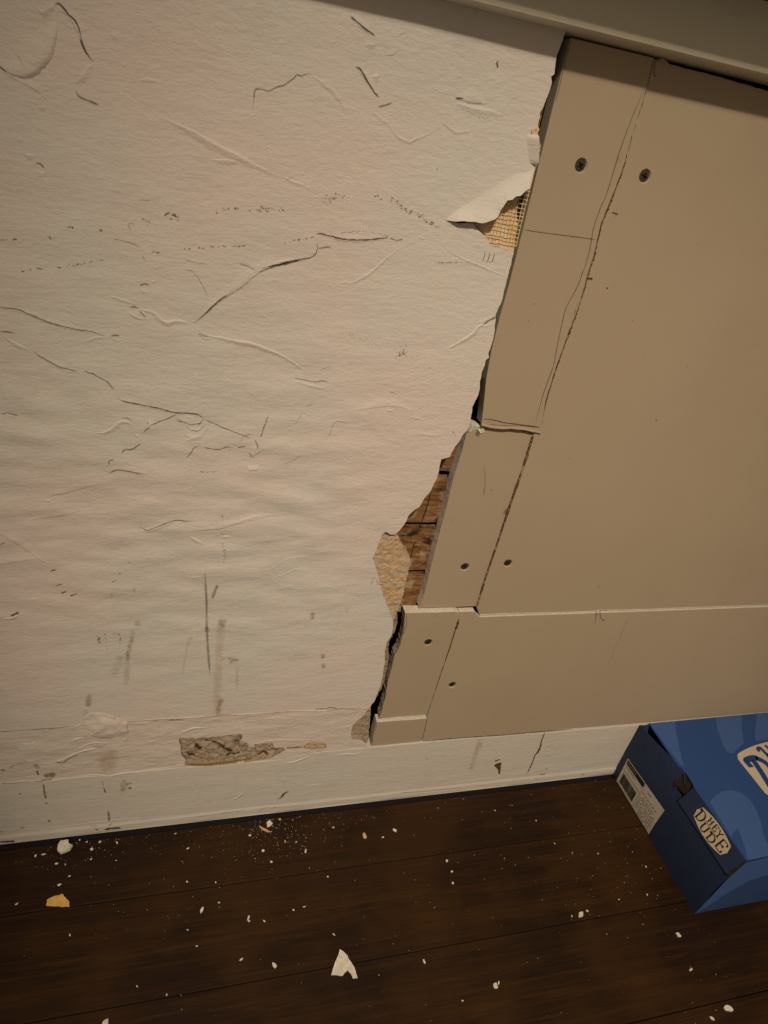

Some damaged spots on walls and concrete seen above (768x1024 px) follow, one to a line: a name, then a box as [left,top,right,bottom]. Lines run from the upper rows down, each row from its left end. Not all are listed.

crack [37,3,95,84]
crack [351,15,376,37]
crack [356,67,380,99]
spalling [654,58,768,91]
flaking render [446,125,541,261]
crack [110,233,388,372]
crack [0,307,118,374]
crack [117,398,200,416]
spalling [468,380,485,433]
spalling [351,532,410,742]
spalling [179,734,326,766]